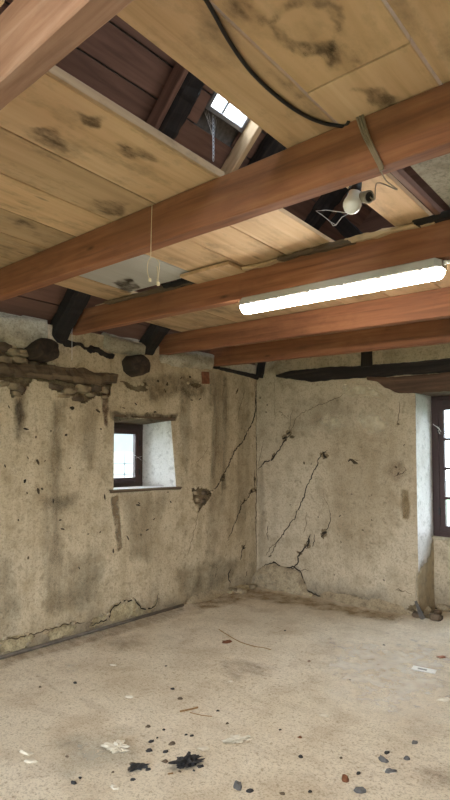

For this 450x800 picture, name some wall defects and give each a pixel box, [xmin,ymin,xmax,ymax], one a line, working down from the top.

leakage [15,399,25,436]
leakage [114,412,176,421]
flaking render [192,486,213,512]
crack [207,367,341,596]
leakage [111,496,122,551]
crack [2,593,159,641]